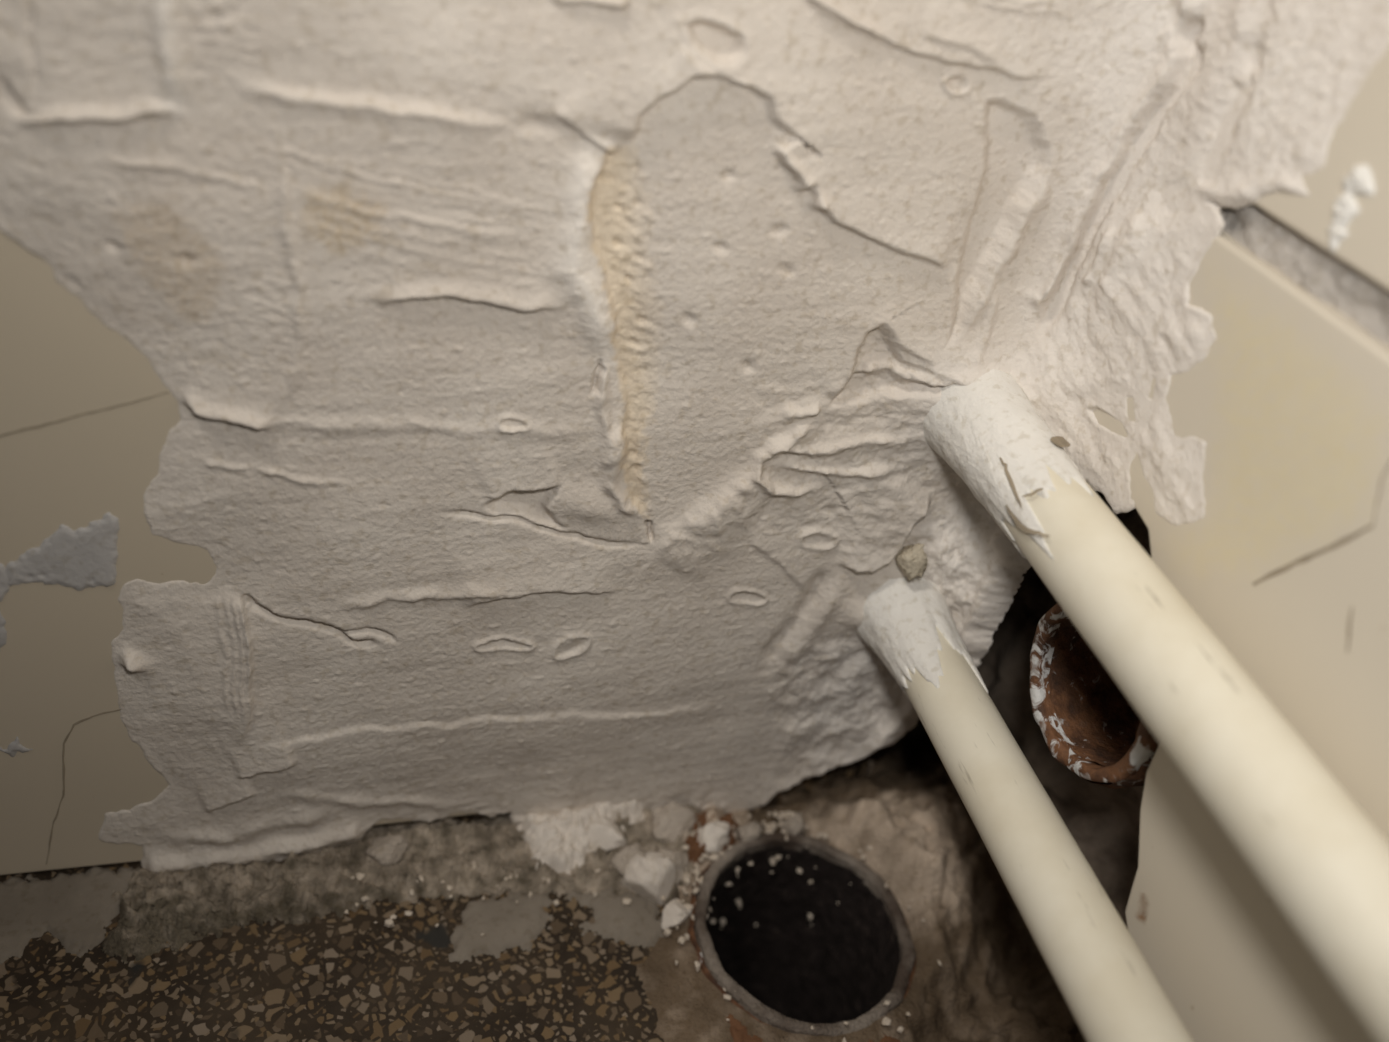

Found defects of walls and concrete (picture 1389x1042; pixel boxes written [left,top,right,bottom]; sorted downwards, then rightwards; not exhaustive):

crack [0,391,169,437]
peeling [5,512,120,591]
crack [1252,465,1389,586]
crack [238,592,399,648]
crack [46,709,122,865]